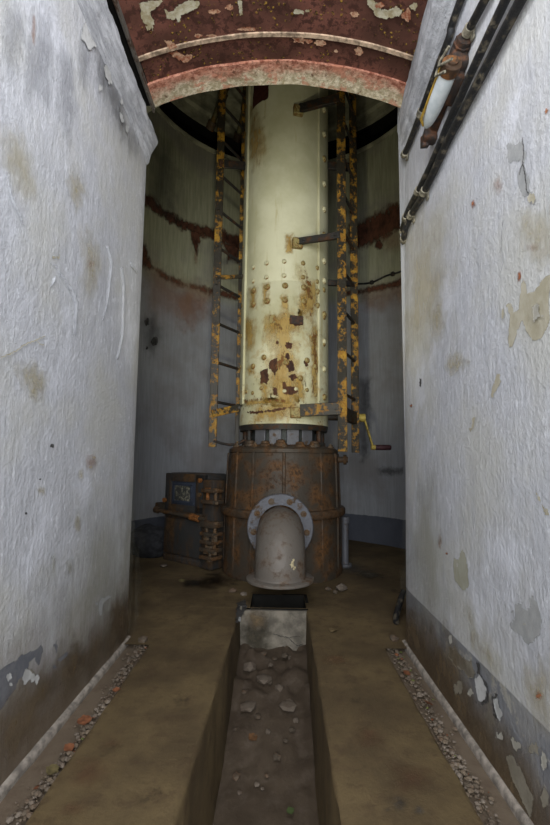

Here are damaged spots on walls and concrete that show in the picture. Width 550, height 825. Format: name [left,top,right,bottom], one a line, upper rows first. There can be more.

peeling [140,0,200,31]
corrosion [165,40,192,63]
peeling [208,0,243,16]
corrosion [293,37,326,46]
peeling [367,0,417,22]
crack [519,139,528,193]
corrosion [145,194,239,263]
corrosion [346,202,400,249]
peeling [501,275,550,347]
peeling [0,645,43,710]
peeling [448,635,502,721]
peeling [495,732,549,818]